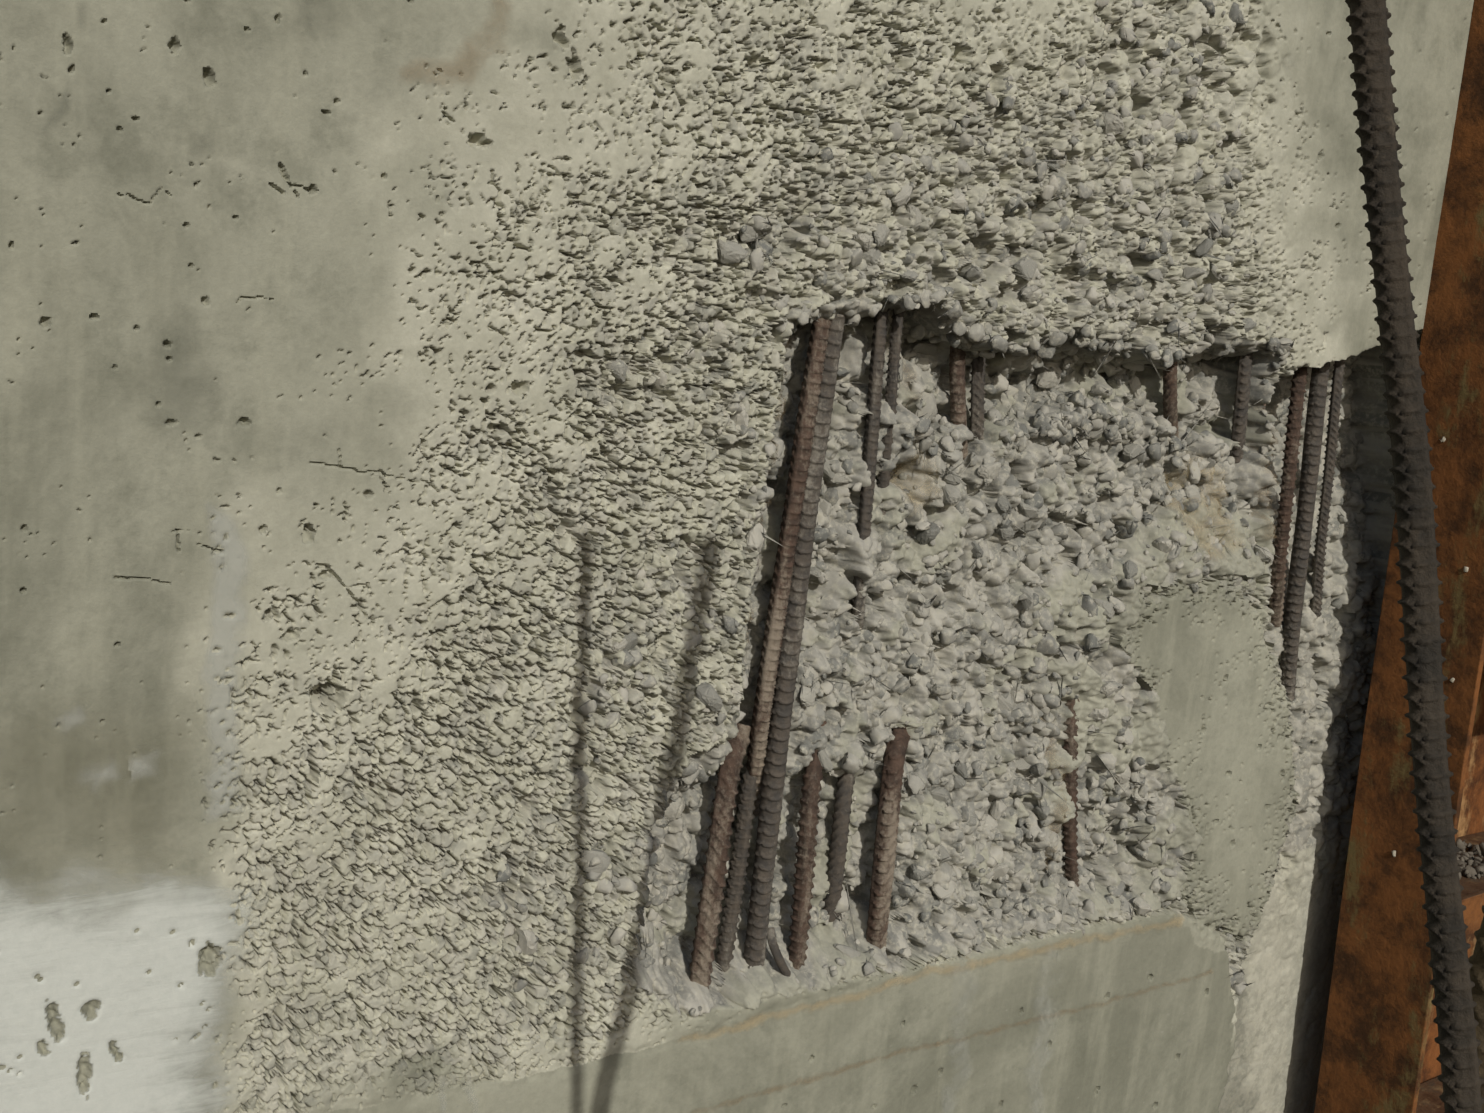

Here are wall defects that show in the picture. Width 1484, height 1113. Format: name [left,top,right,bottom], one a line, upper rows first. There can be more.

spalling [302,522,316,545]
hole [264,605,302,641]
spalling [630,285,1396,1113]